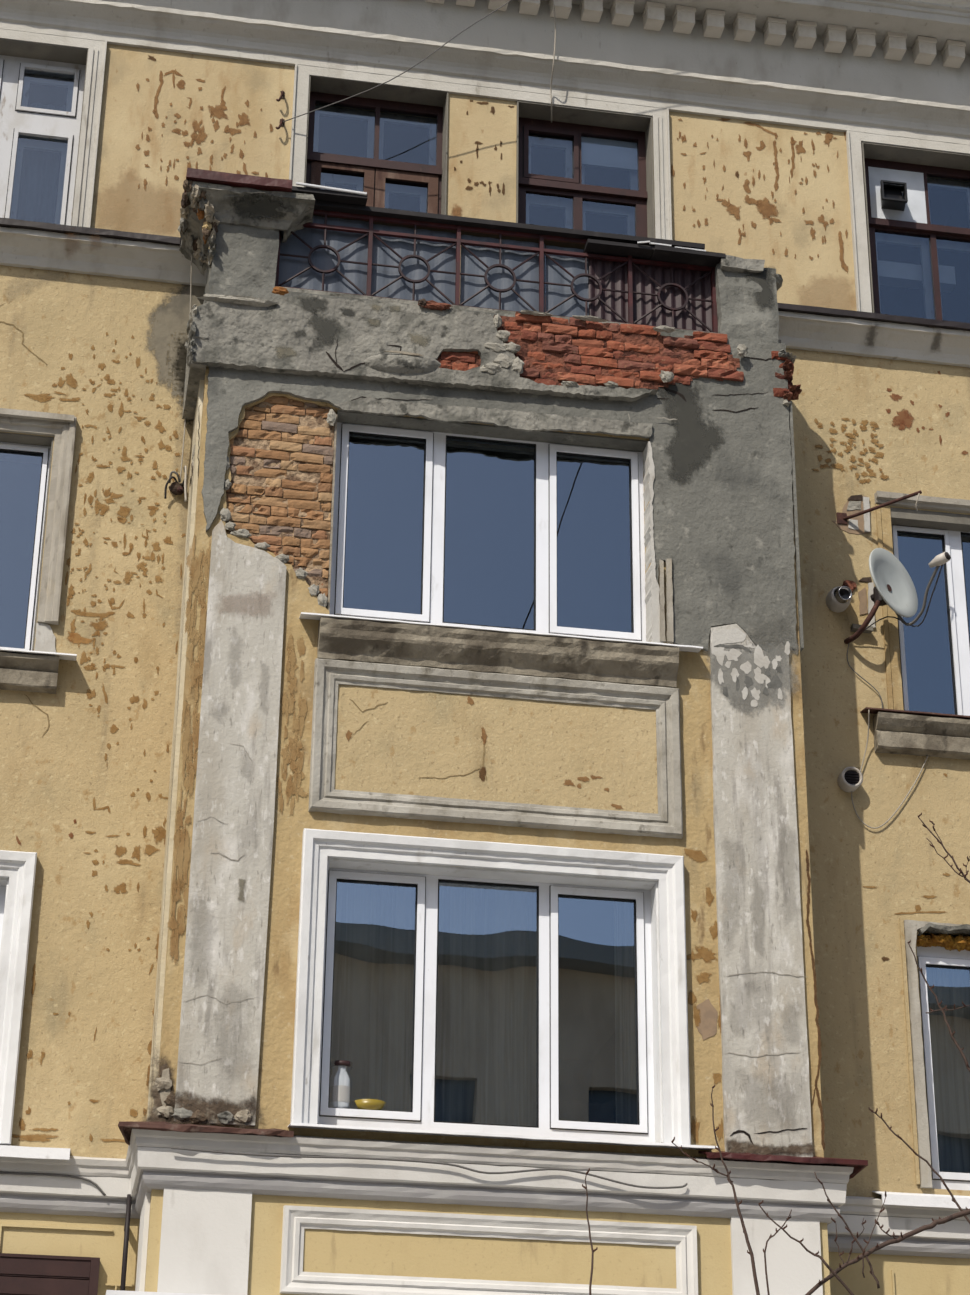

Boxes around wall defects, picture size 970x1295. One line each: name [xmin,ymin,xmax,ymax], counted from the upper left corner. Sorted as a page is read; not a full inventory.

peeling [135,55,273,268]
peeling [671,118,848,273]
spalling [437,310,748,389]
spalling [771,351,802,407]
spalling [219,396,336,608]
water stain [658,382,724,484]
peeling [812,388,942,535]
peeling [710,628,798,712]
crack [725,850,825,1150]
peeling [12,1106,58,1142]
spalling [130,1041,261,1129]